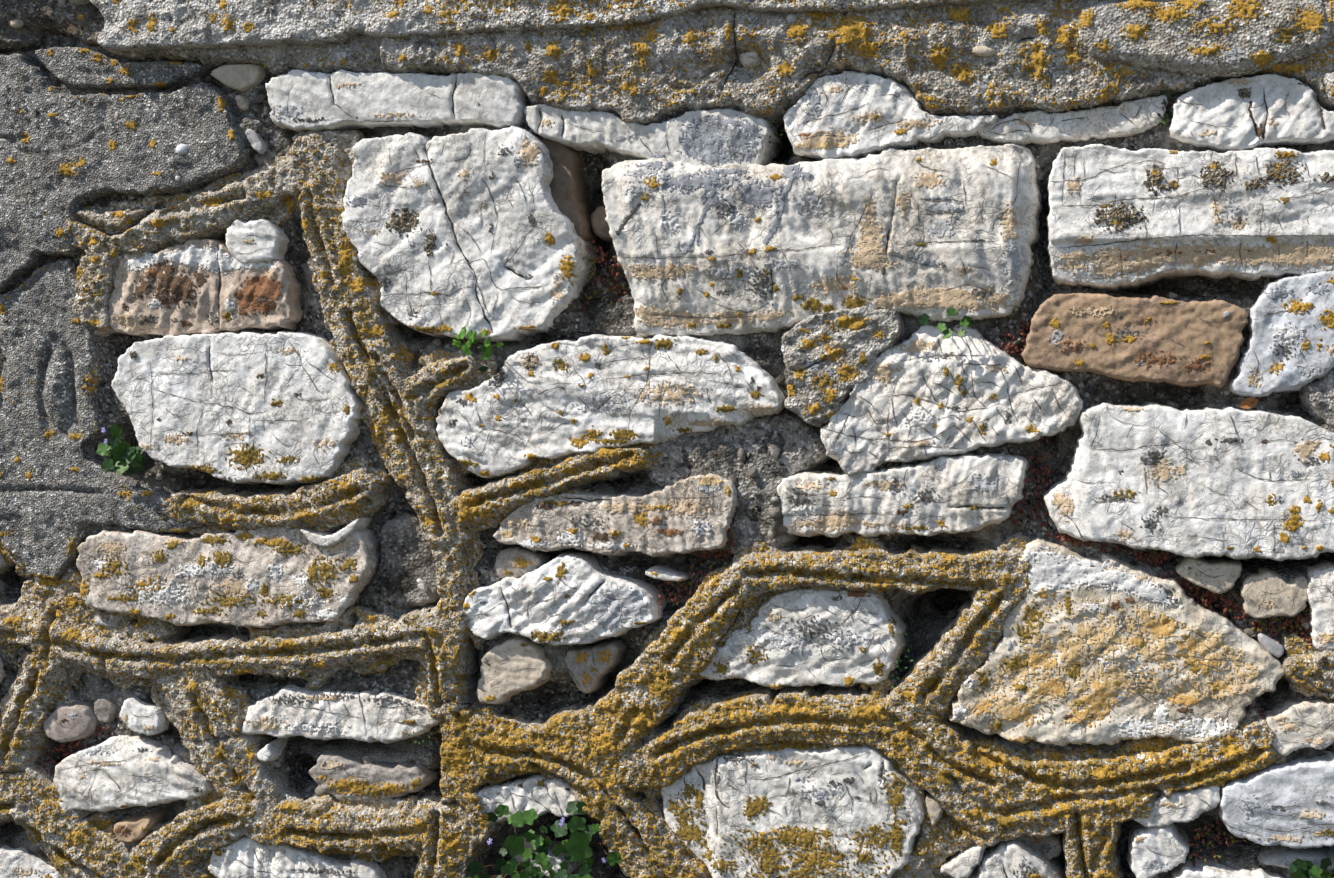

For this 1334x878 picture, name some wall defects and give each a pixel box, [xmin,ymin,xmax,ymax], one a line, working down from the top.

crack [0,248,78,442]
crack [79,193,343,467]